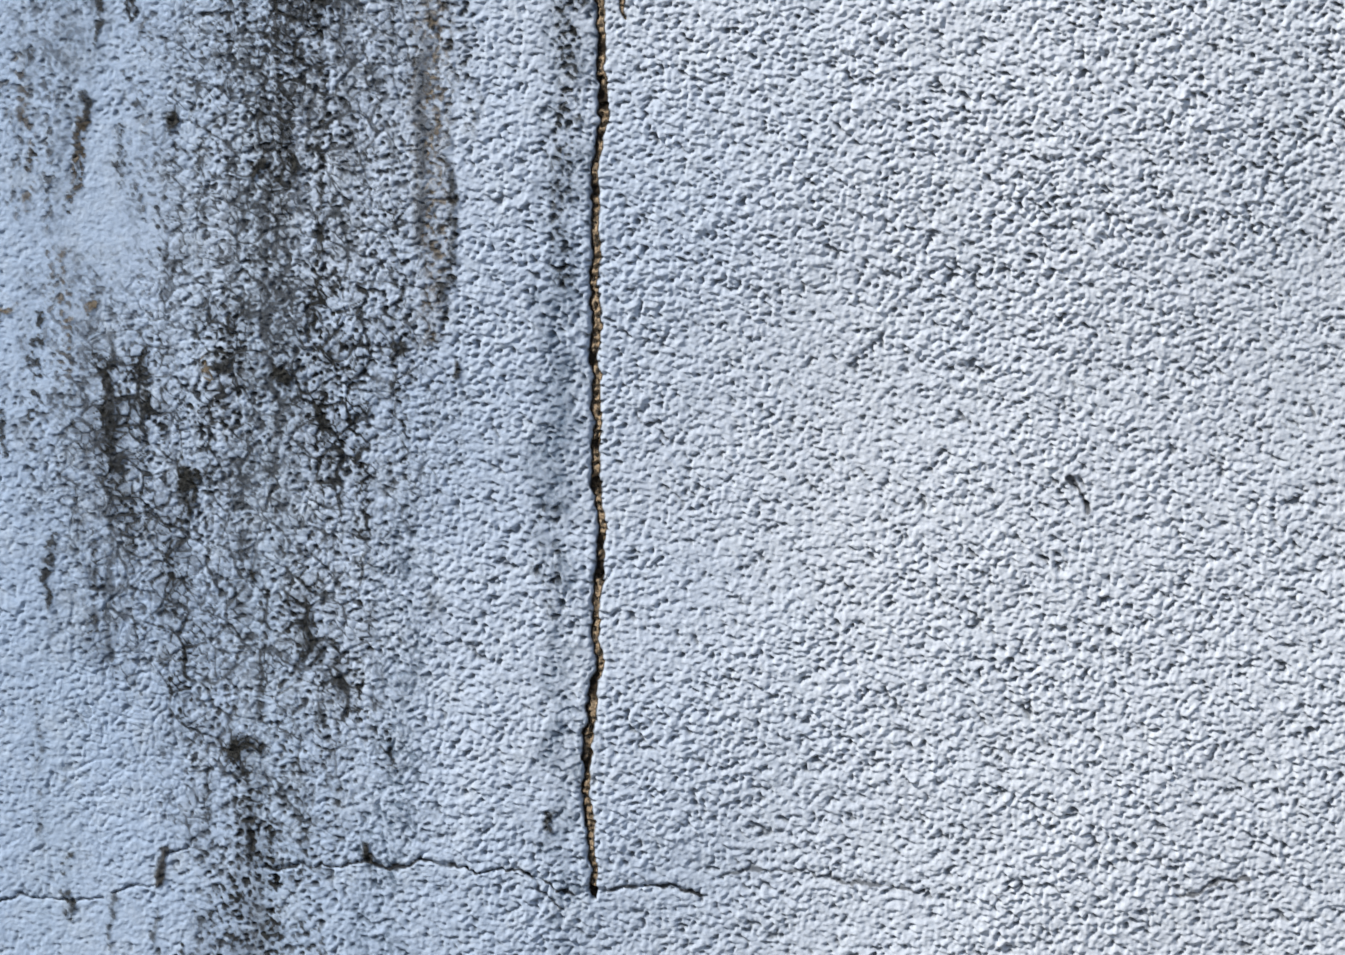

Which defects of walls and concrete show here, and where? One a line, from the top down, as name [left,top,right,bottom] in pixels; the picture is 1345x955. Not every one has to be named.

water stain [0,49,92,229]
water stain [26,251,69,420]
water stain [0,409,10,458]
water stain [69,0,435,955]
crack [262,0,916,910]
water stain [40,532,58,609]
water stain [59,852,77,921]